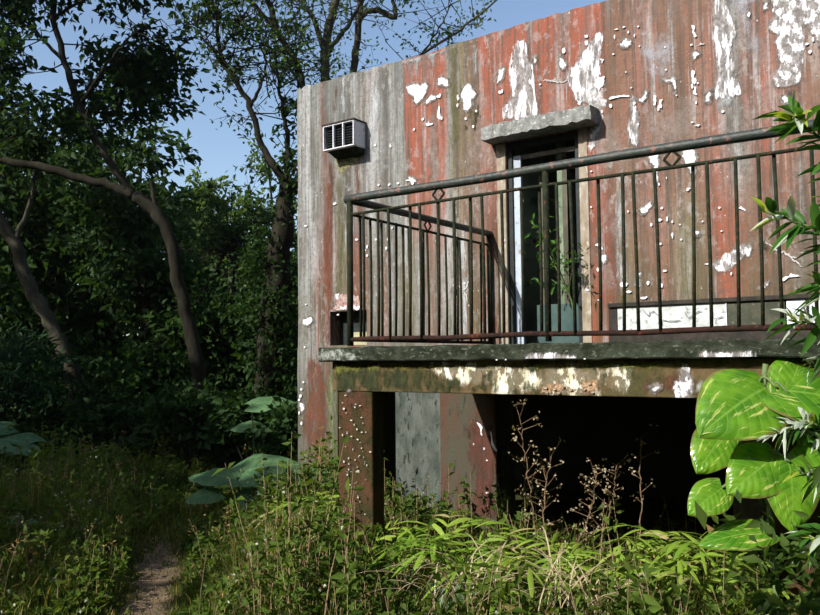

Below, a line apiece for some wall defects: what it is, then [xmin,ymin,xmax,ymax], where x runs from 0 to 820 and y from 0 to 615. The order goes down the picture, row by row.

peeling [558,47,568,71]
peeling [406,75,450,126]
peeling [456,82,477,129]
corrosion [324,163,333,340]
peeling [706,243,753,275]
spalling [541,378,599,394]
corrosion [303,361,327,464]